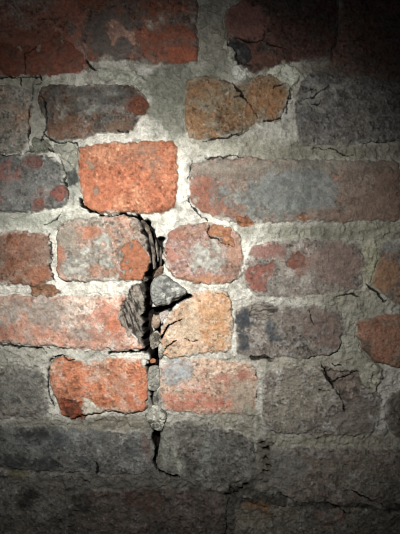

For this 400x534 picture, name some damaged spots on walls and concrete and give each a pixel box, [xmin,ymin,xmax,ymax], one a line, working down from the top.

crack [232,83,328,122]
crack [0,46,197,371]
crack [319,363,357,411]
crack [152,430,180,477]